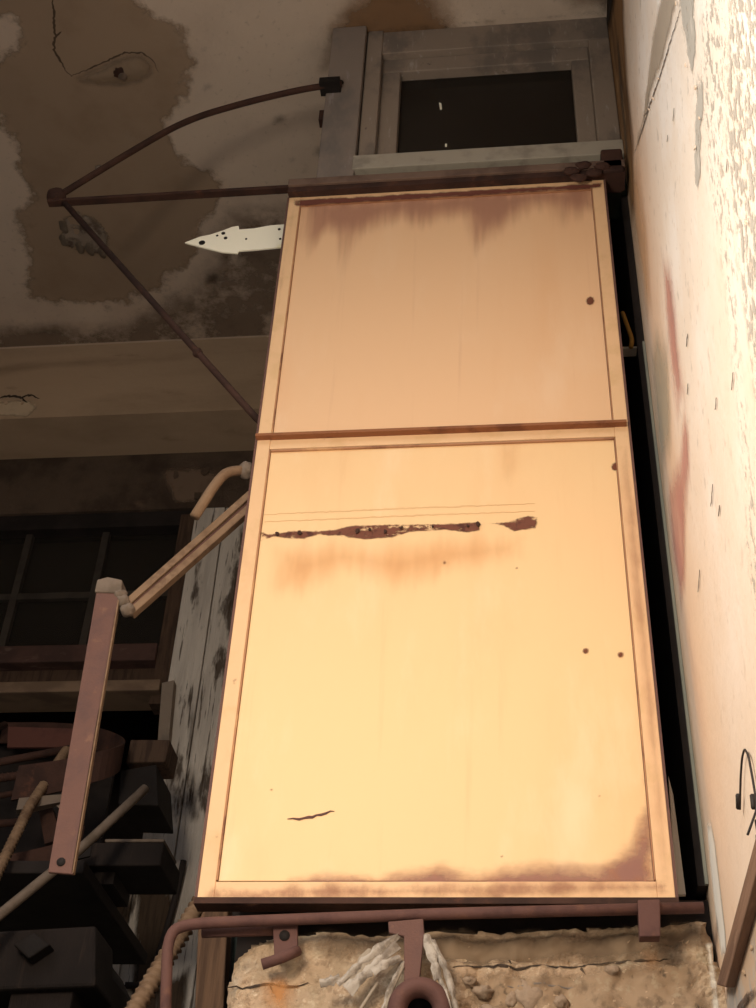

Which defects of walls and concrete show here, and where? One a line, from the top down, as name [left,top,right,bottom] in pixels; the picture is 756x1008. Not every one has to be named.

crack [52,0,158,77]
damp [338,0,447,35]
crack [634,11,680,153]
damp [0,0,222,305]
damp [242,221,278,229]
damp [607,0,645,270]
peeling [675,0,756,365]
damp [0,248,281,347]
crack [453,958,668,989]
spalling [474,963,703,1008]
peeling [726,915,756,1008]